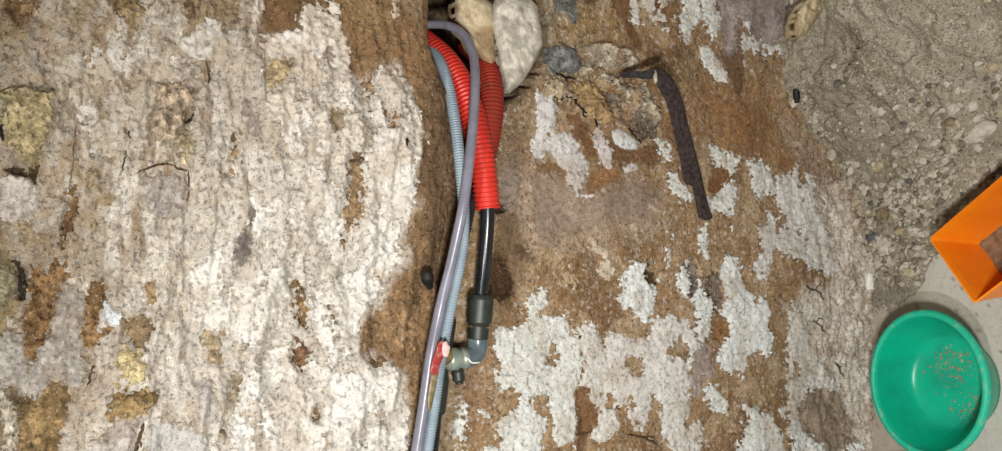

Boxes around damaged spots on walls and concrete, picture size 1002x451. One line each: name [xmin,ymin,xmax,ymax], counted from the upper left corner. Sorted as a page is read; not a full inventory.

spalling [581,42,665,140]
spalling [687,258,724,310]